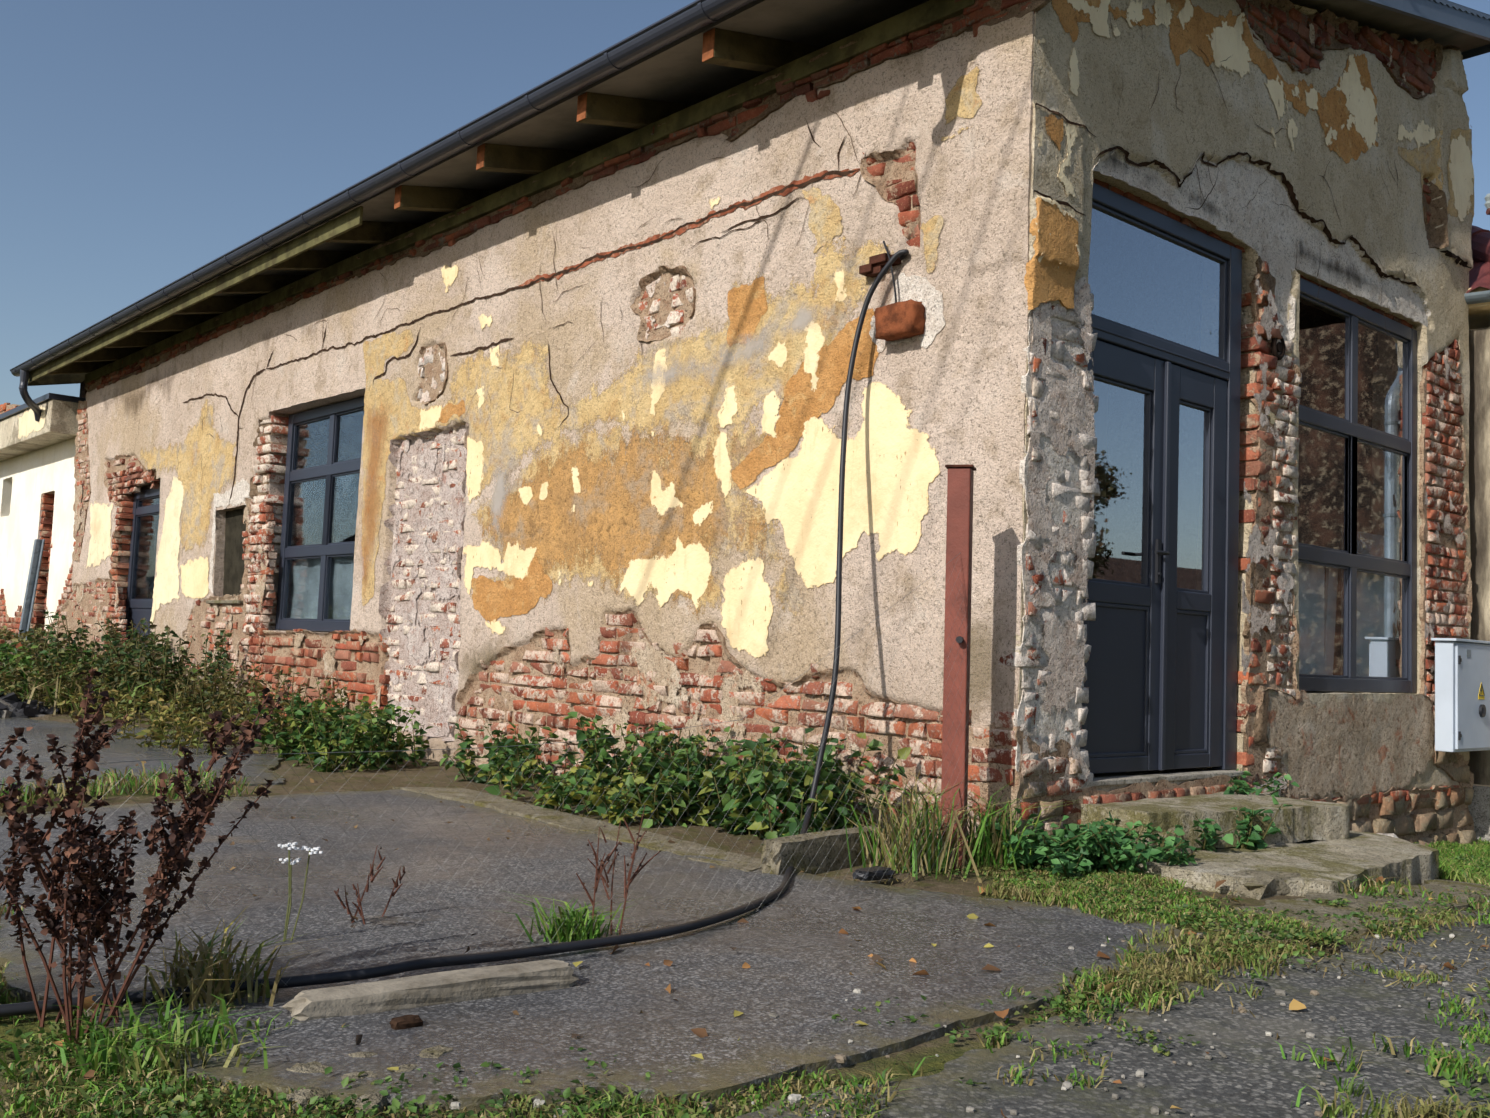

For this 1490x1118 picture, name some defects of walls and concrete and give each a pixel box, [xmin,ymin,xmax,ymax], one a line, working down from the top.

crack [134,110,866,502]
flaking render [0,0,1194,724]
flaking render [453,381,943,839]
crack [1033,190,1086,216]
crack [1035,103,1096,137]
flaking render [967,0,1474,866]
crack [1119,46,1472,345]